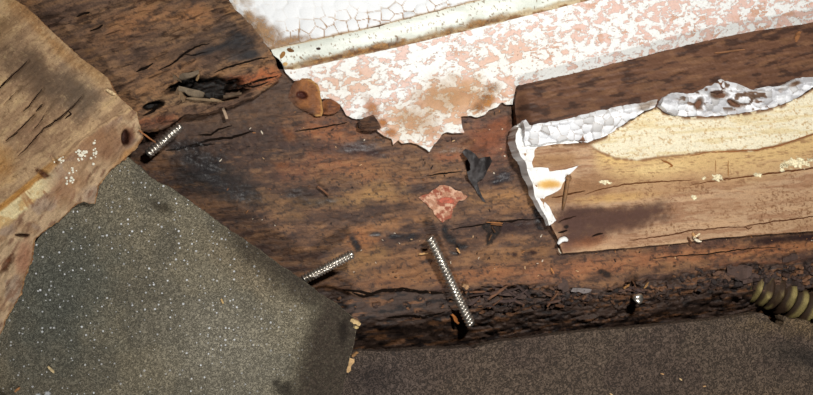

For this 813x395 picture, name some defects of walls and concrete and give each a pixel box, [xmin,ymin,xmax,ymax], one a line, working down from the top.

crack [0,60,82,156]
spalling [168,70,244,103]
crack [552,134,813,198]
crack [450,216,576,233]
crack [633,216,813,259]